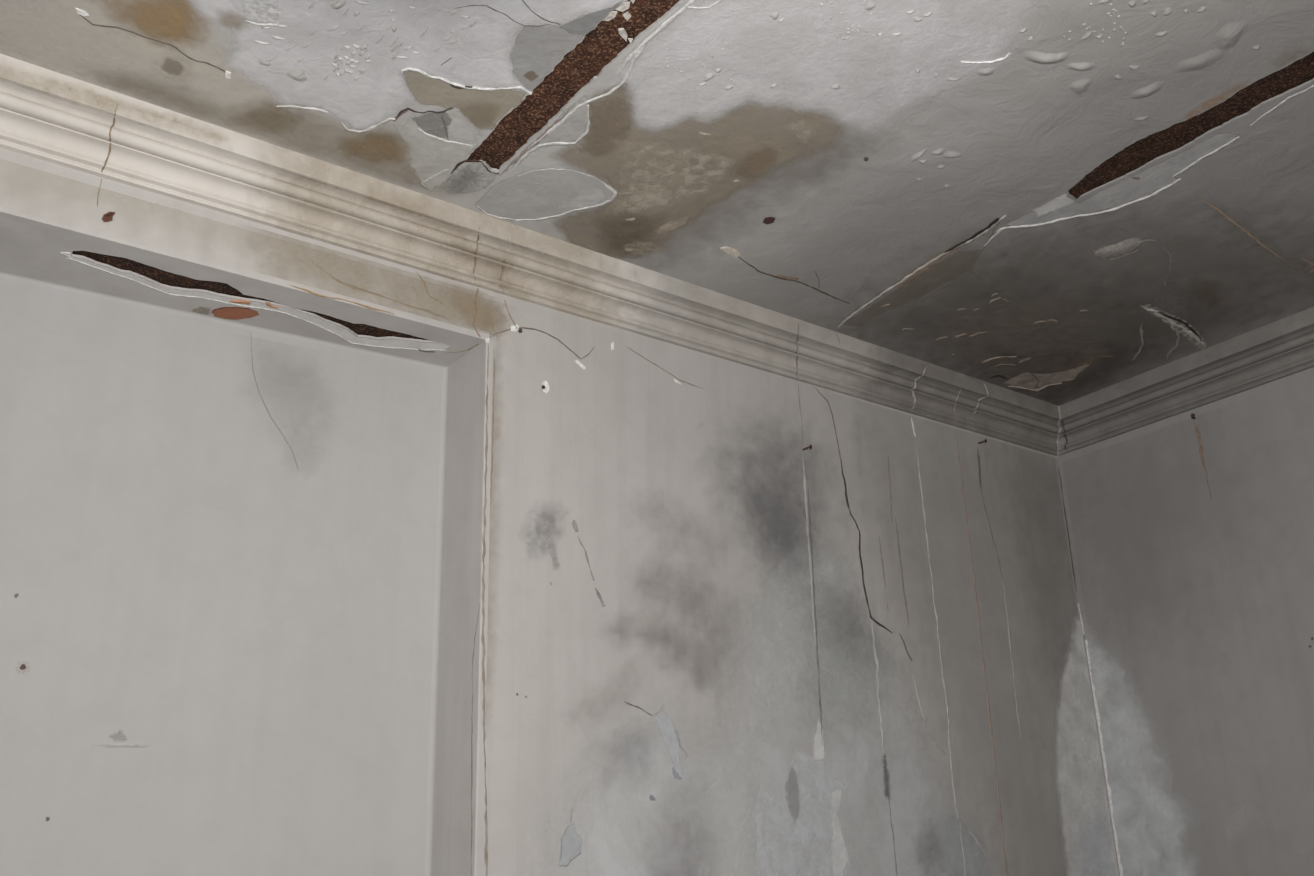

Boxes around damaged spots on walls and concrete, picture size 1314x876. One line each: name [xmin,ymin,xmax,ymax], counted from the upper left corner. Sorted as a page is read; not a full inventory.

leakage [75,0,333,218]
spalling [341,0,740,221]
leakage [549,87,839,257]
peeling [984,85,1314,247]
rust [72,251,273,320]
spalling [60,252,450,352]
rust [301,309,427,340]
crack [720,215,1007,343]
crack [911,366,927,436]
crack [795,325,924,719]
leakage [560,542,983,876]
leakage [1057,603,1194,876]